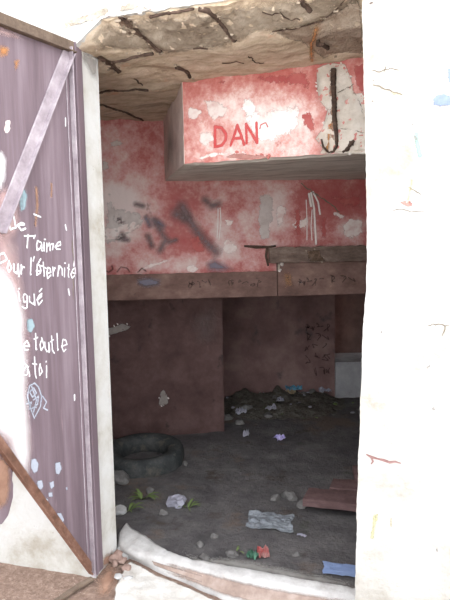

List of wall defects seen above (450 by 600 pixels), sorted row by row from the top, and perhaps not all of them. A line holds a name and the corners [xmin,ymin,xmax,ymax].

spalling [61,0,373,155]
peeling [104,193,143,244]
peeling [333,212,363,239]
spalling [108,323,130,337]
spalling [159,390,169,407]
crack [366,454,401,464]